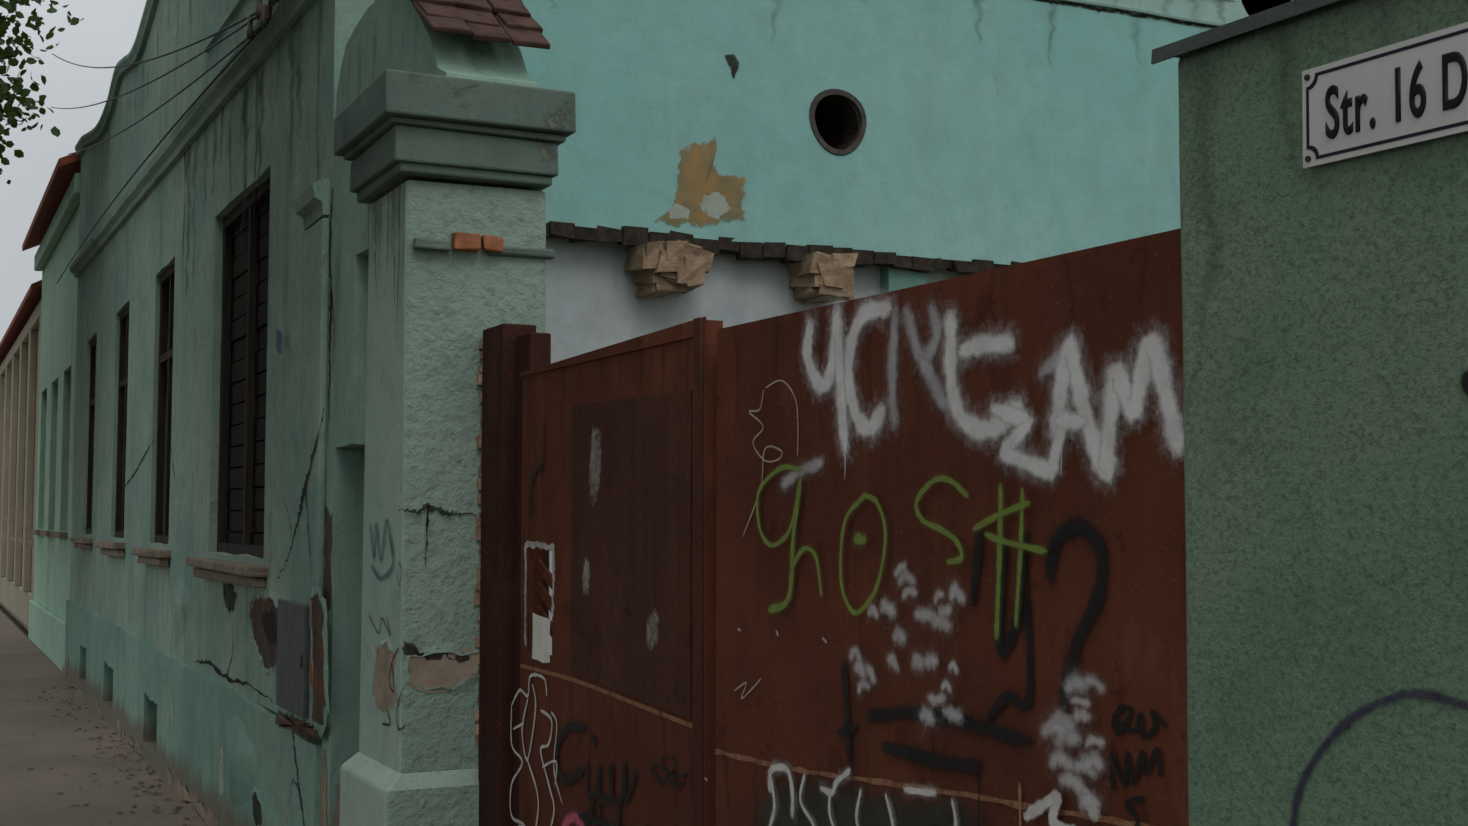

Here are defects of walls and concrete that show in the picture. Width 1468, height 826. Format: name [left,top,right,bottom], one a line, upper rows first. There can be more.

flaking render [655,137,745,228]
crack [276,188,334,583]
flaking render [372,339,483,764]
crack [195,628,272,702]
flaking render [223,583,278,677]
flaking render [275,505,332,826]
crack [290,732,304,825]